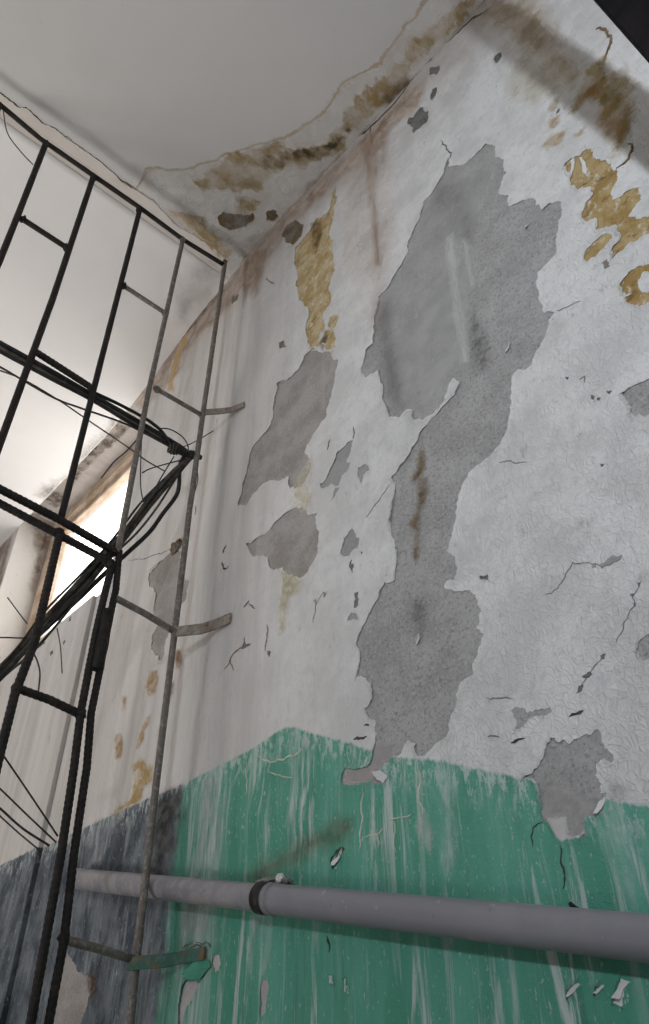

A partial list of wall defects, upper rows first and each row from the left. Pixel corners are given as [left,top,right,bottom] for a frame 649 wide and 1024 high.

damp [136,0,443,266]
flaking render [407,58,442,133]
damp [446,0,633,169]
peeling [216,185,371,581]
peeling [617,376,649,423]
corrosion [410,452,426,528]
peeling [339,141,566,793]
peeling [148,549,191,664]
peeling [521,726,618,849]